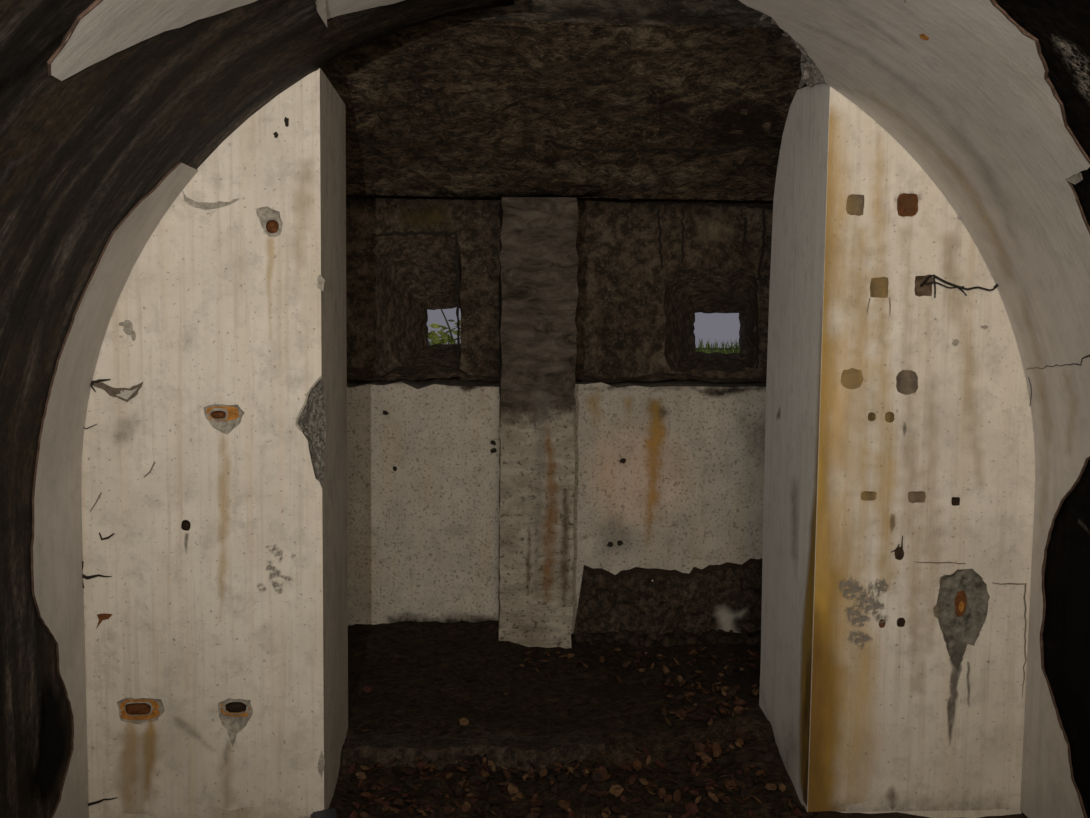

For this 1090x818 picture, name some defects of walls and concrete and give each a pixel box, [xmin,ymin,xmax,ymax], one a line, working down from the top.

peeling [47,0,257,81]
peeling [314,0,404,26]
spalling [256,206,283,237]
peeling [31,162,244,818]
spalling [298,375,326,487]
corrosion [648,402,664,507]
corrosion [800,156,847,812]
peeling [739,0,1090,818]
crack [1026,355,1090,404]
spalling [258,546,293,593]
spalling [573,558,763,636]
corrosion [119,699,160,784]